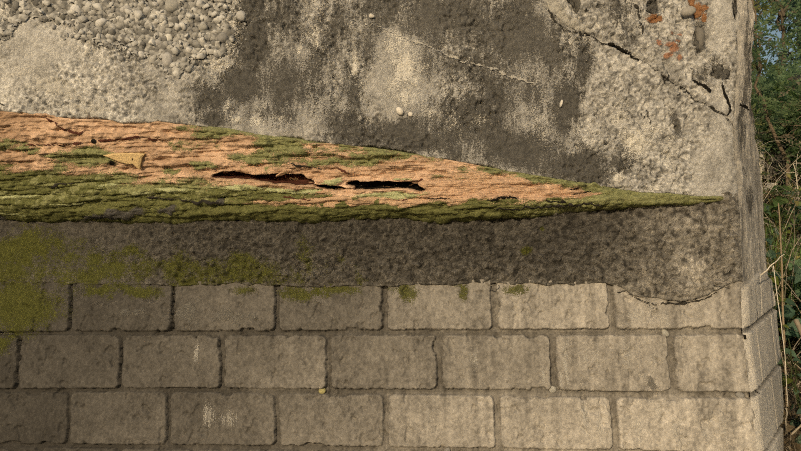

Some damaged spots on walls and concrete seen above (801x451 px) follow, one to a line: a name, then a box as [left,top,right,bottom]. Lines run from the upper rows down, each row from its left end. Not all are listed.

crack [633,3,644,33]
rust [688,0,709,22]
rust [657,32,683,60]
crack [546,8,750,125]
damp [184,0,686,188]
damp [127,187,193,197]
damp [211,177,343,205]